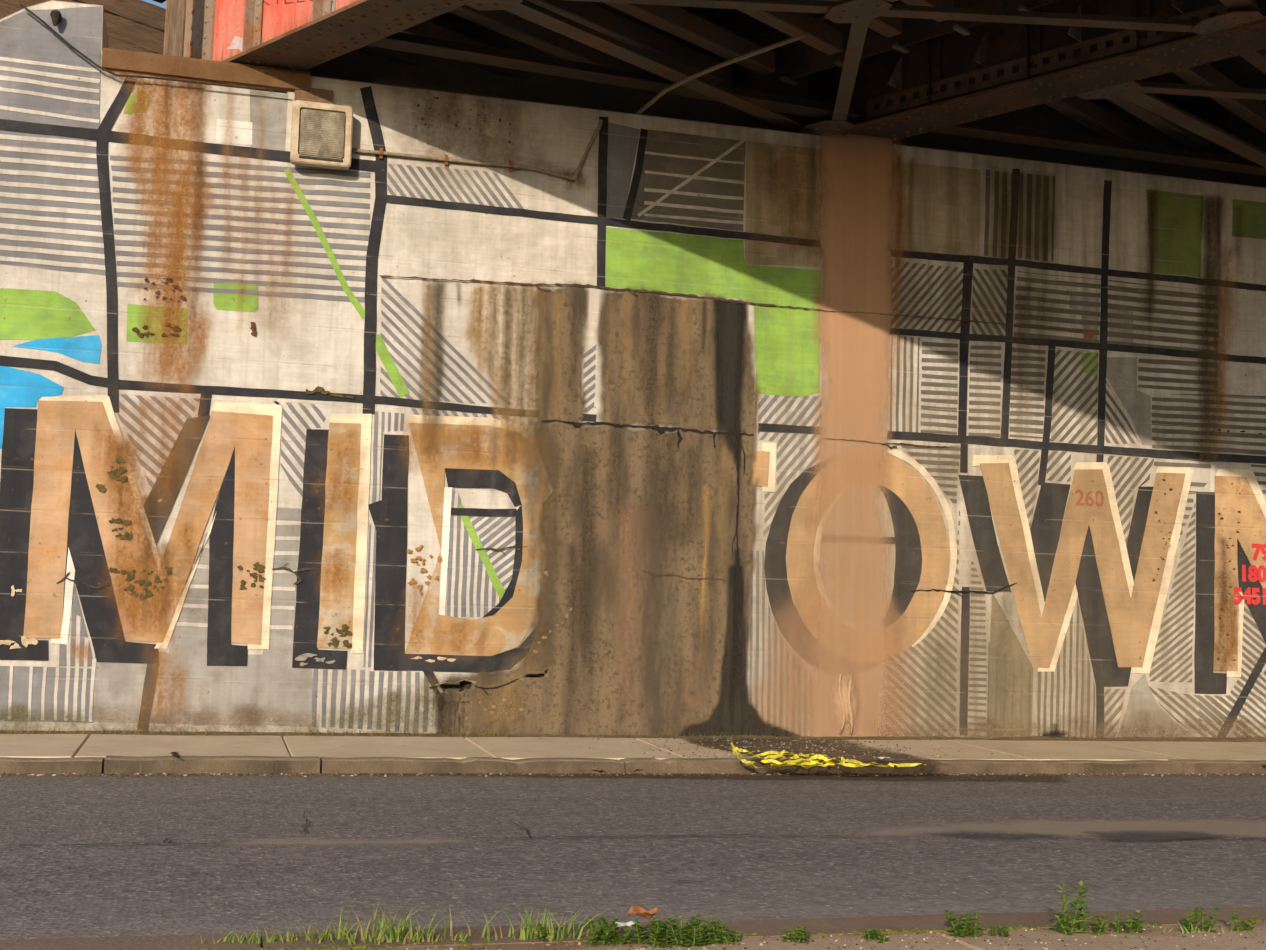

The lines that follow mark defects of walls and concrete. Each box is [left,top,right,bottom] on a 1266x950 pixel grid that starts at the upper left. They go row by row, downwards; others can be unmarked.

rust [111,70,208,387]
water stain [422,285,442,450]
water stain [458,285,556,556]
peeling [407,285,758,736]
crack [542,409,754,582]
crack [822,438,952,450]
crack [911,583,1017,597]
water stain [1199,199,1222,459]